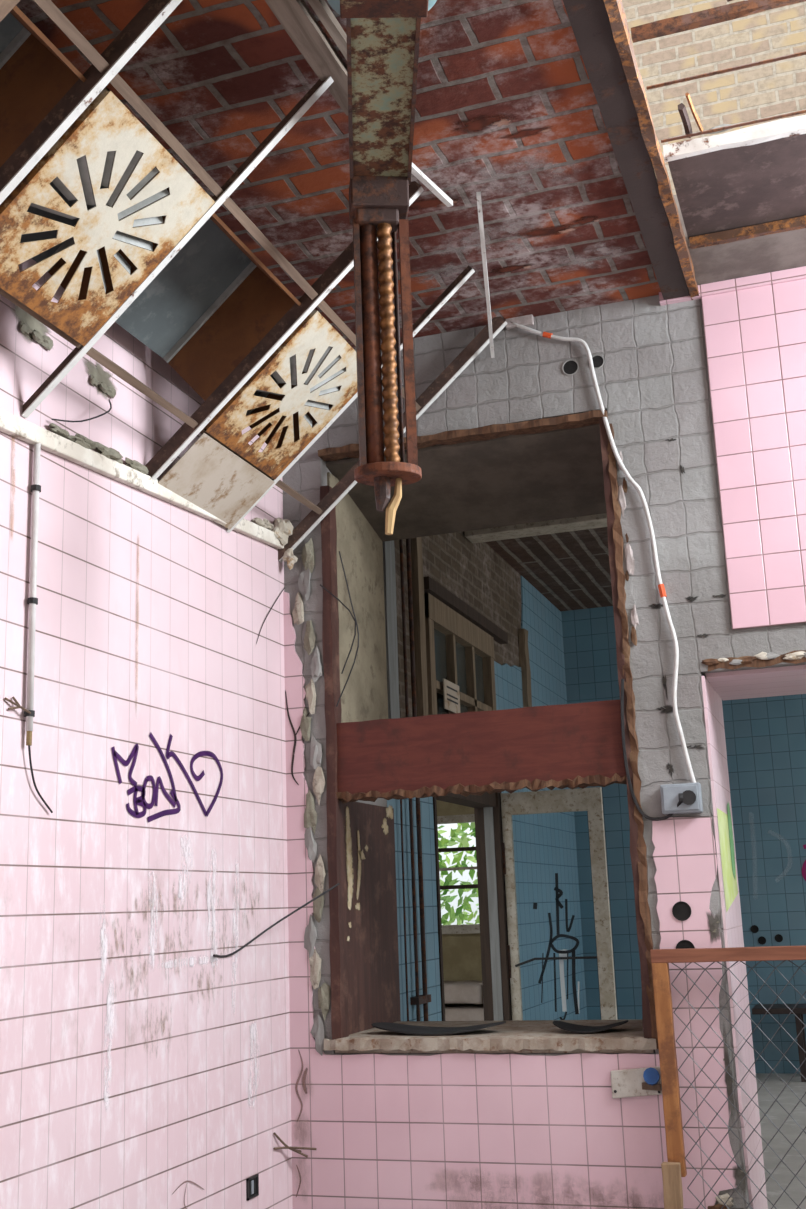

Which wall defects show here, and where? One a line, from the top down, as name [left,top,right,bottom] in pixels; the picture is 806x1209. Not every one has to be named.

flaking render [292,537,330,1056]